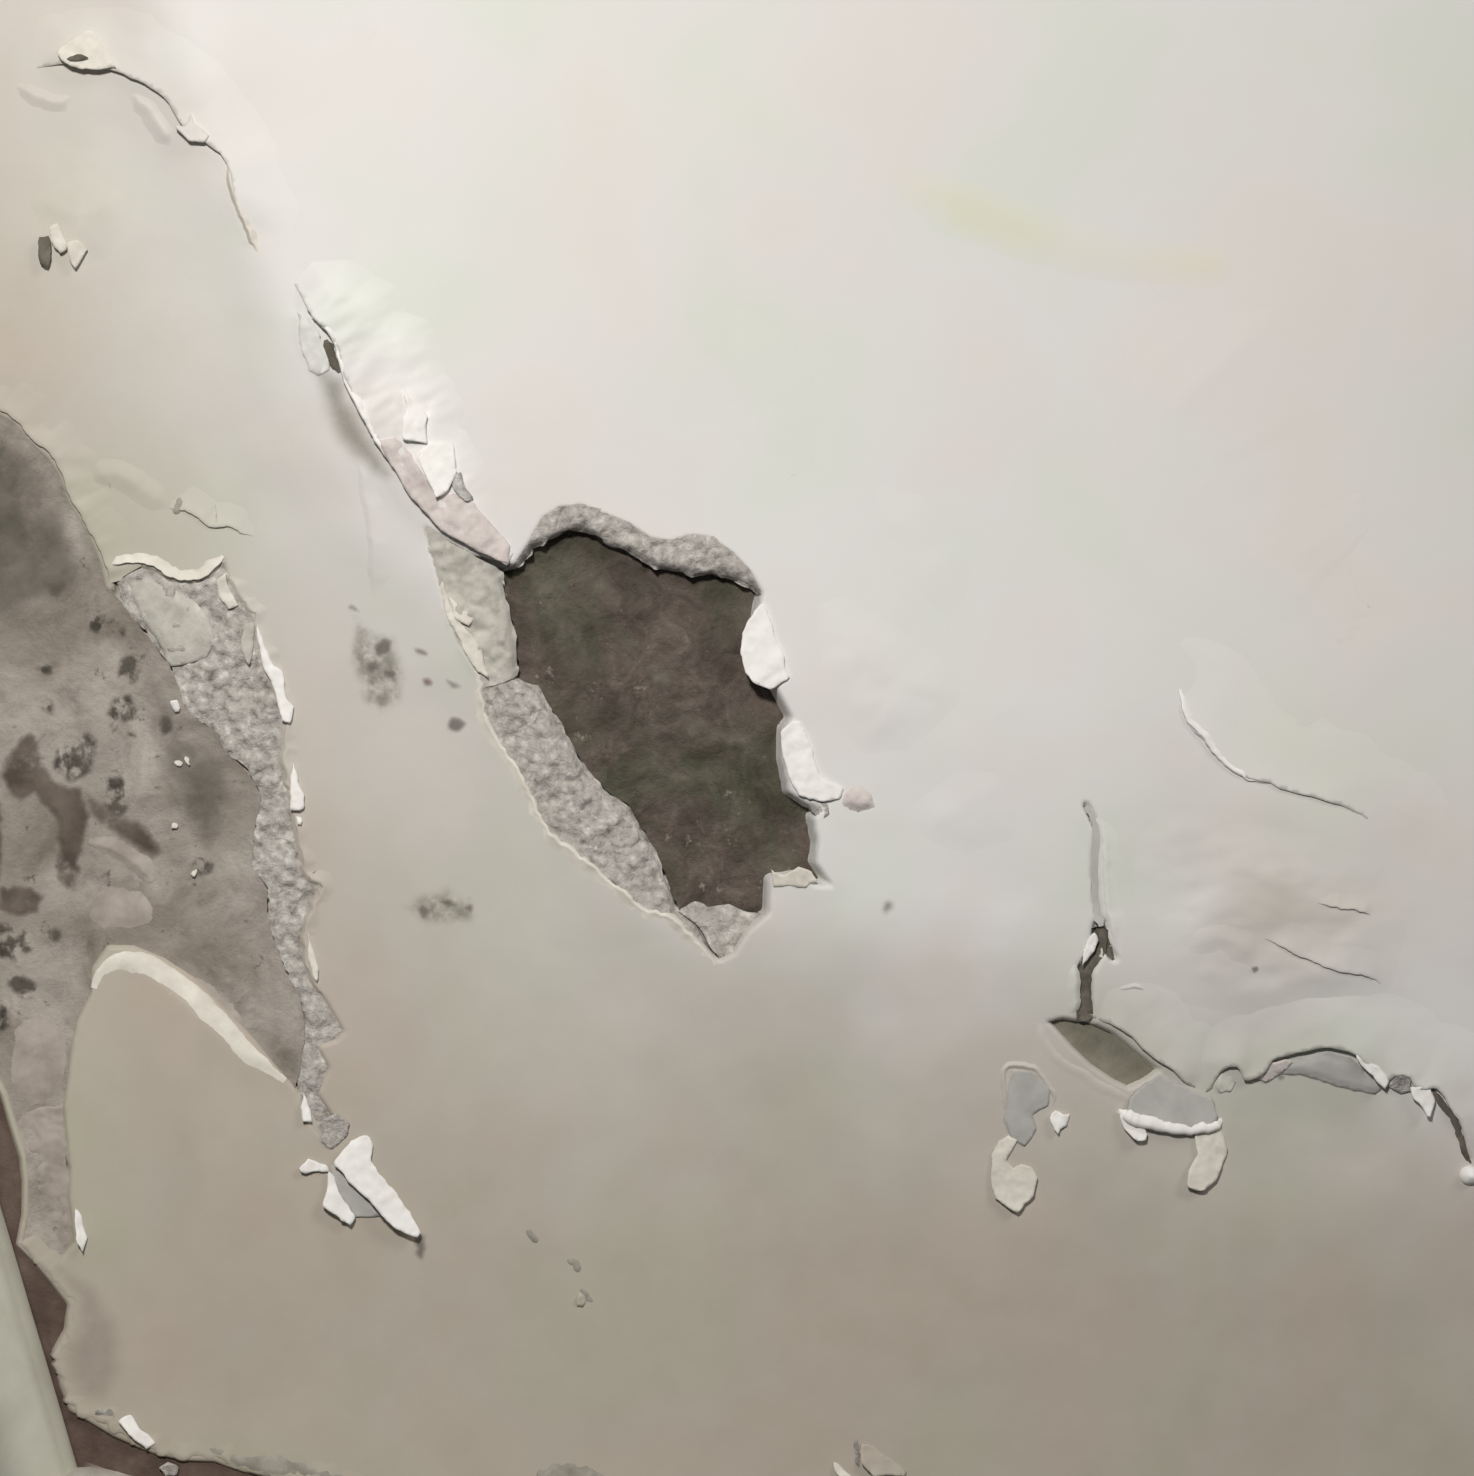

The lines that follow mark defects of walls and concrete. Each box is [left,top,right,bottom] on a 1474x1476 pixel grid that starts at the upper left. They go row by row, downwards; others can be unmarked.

peeling [57,30,115,70]
peeling [175,114,209,142]
spalling [294,260,875,966]
crack [1179,637,1449,823]
peeling [0,381,422,1476]
peeling [990,981,1474,1213]
peeling [567,1258,593,1307]
peeling [536,1463,604,1476]